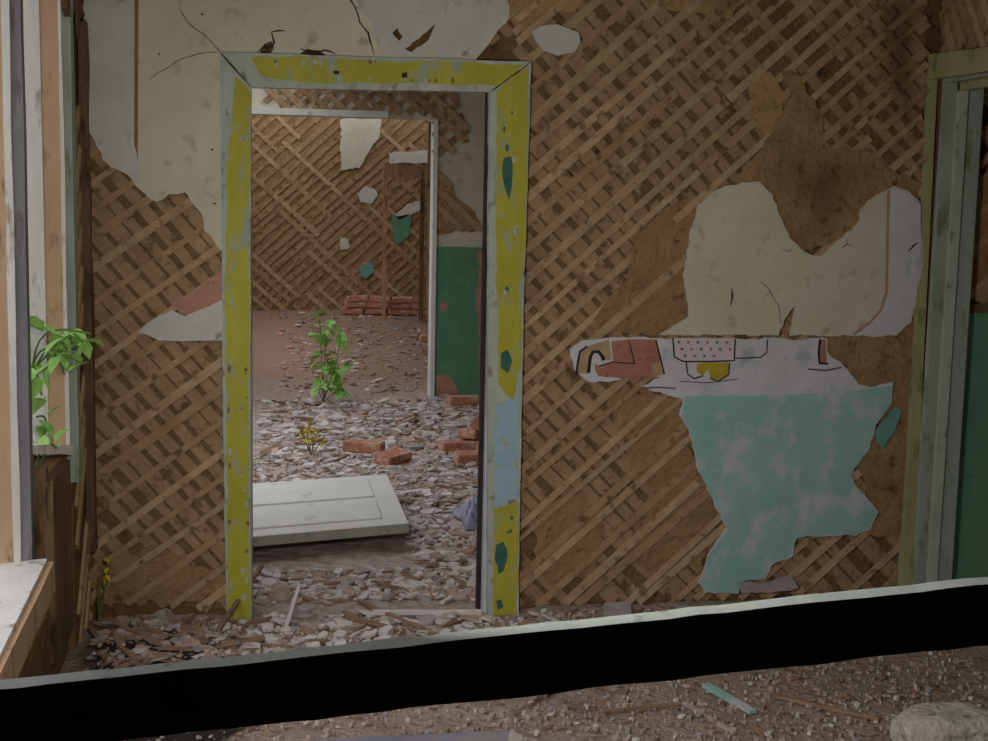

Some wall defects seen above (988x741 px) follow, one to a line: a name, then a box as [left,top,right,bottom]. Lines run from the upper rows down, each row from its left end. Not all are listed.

crack [150,1,223,79]
crack [350,0,398,54]
flaking render [939,0,988,53]
flaking render [970,123,988,304]
flaking render [61,0,931,642]